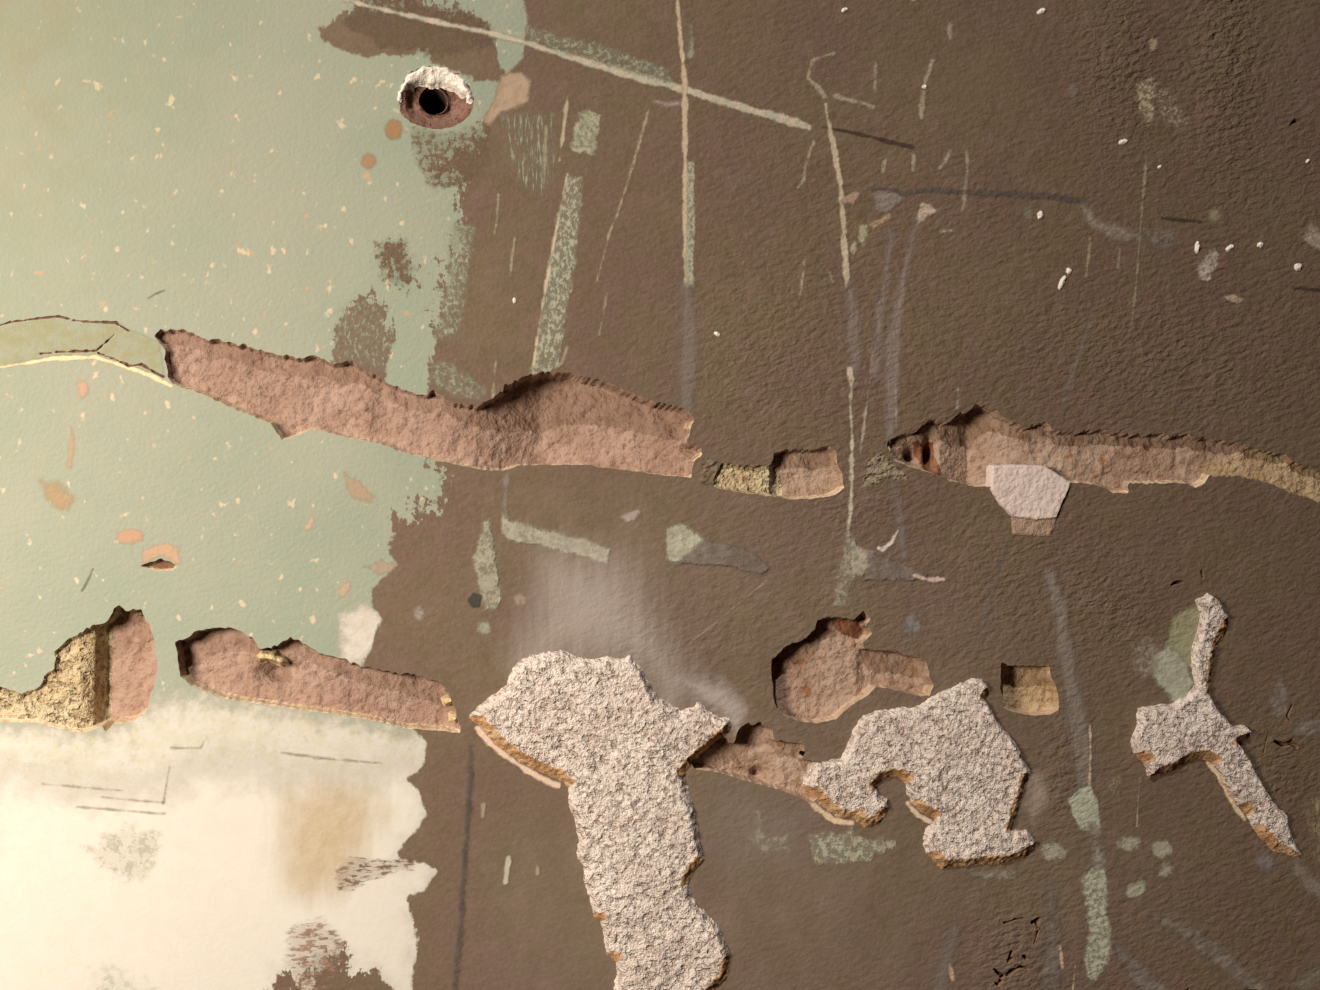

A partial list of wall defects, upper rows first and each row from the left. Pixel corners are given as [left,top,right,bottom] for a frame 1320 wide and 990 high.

crack [0,315,165,378]
spalling [0,355,844,501]
peeling [622,509,640,522]
flaking render [861,446,1319,536]
spalling [771,611,934,723]
spalling [1004,706,1059,715]
peeling [0,671,577,990]
spalling [675,722,889,828]
spalling [868,768,915,789]
spalling [906,797,942,824]